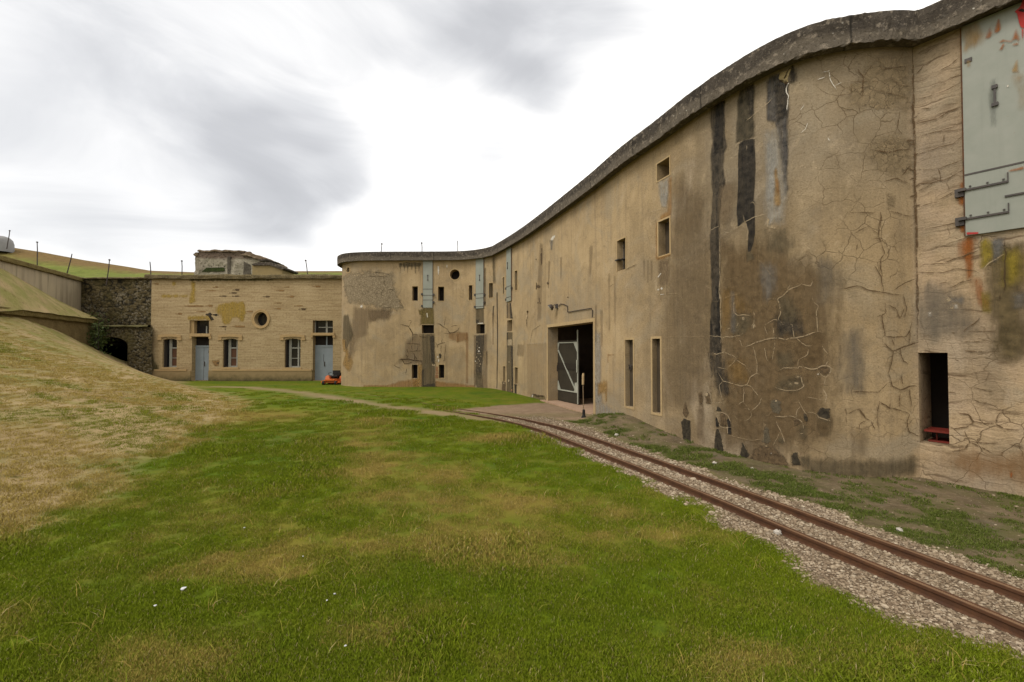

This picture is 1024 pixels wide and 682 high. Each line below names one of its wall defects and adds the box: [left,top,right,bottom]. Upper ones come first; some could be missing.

leakage [710,65,829,448]
crack [686,50,1007,454]
rust [961,225,978,271]
leakage [342,310,389,370]
crack [948,318,1021,452]
leakage [807,458,915,477]